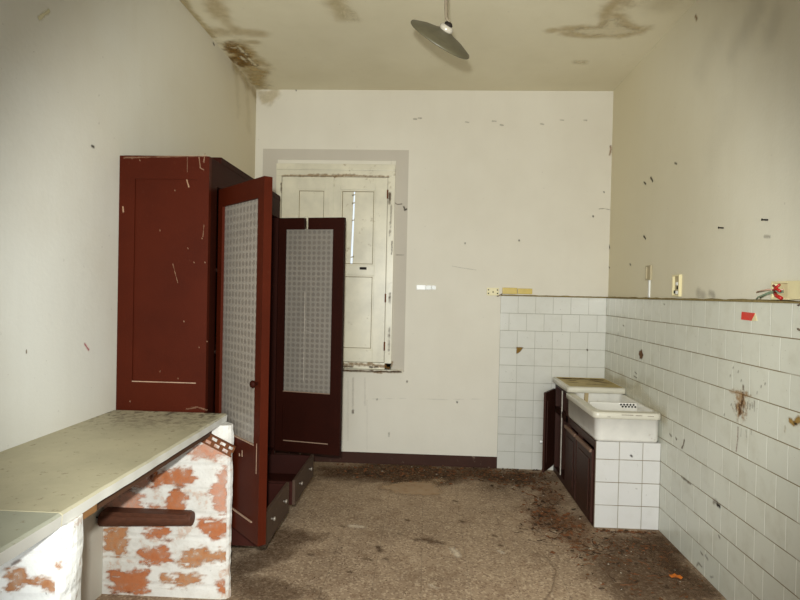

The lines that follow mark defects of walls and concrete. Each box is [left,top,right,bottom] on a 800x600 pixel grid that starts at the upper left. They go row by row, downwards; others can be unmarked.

leakage [224,41,267,86]
rust [736,386,747,418]
peeling [103,467,198,510]
peeling [187,439,227,540]
peeling [3,560,55,592]
peeling [103,526,226,595]